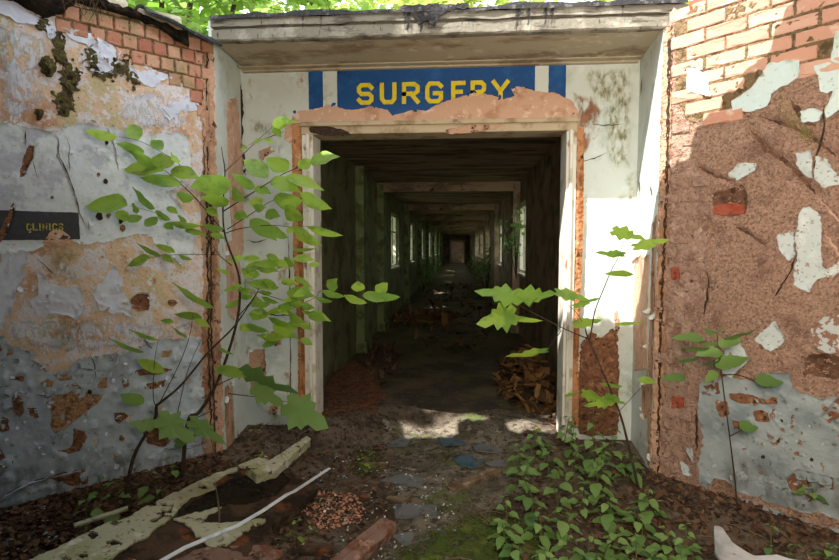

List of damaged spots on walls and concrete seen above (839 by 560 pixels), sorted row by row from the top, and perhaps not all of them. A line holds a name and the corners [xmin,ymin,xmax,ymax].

leakage [579,97,599,151]
crack [813,102,825,176]
peeling [0,0,245,538]
flaking render [631,0,839,533]
flaking render [577,310,621,436]